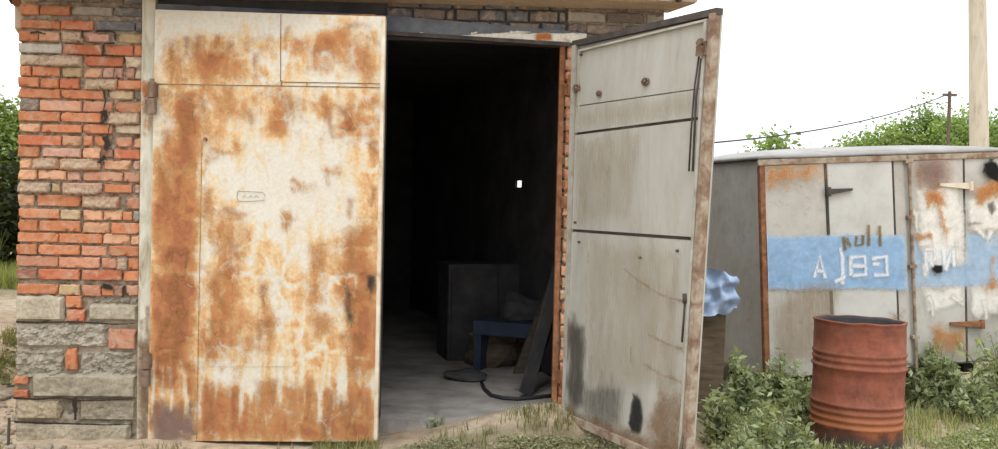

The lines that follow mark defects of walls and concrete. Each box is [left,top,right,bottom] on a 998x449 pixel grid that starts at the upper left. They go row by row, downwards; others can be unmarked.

rust [290,24,376,77]
rust [137,37,379,441]
leakage [567,323,642,433]